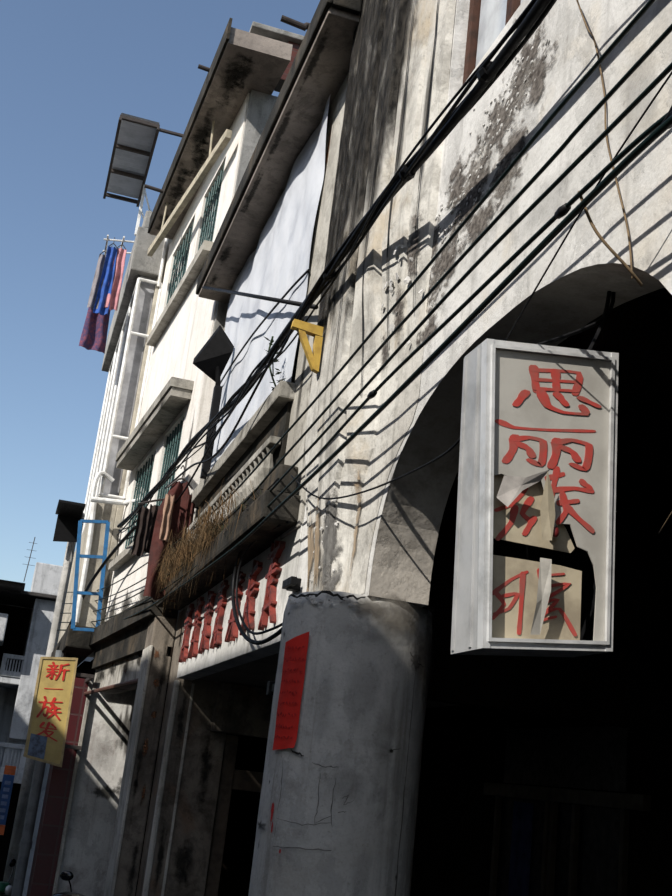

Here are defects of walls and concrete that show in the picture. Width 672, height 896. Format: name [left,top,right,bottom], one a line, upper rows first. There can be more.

water stain [304,29,328,80]
water stain [420,64,432,147]
water stain [157,55,253,230]
water stain [241,174,261,212]
water stain [267,110,291,161]
water stain [317,0,416,336]
water stain [297,354,311,412]
water stain [117,707,132,752]
water stain [94,779,122,799]